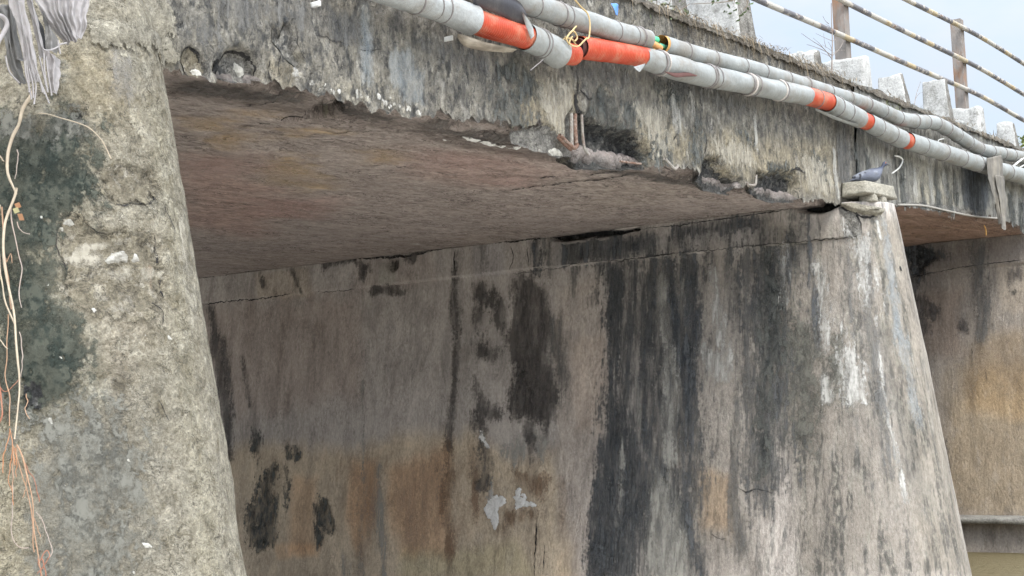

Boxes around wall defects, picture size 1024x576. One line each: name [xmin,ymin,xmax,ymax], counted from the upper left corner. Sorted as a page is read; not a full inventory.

spalling [180,48,254,83]
spalling [509,81,666,171]
crack [512,170,638,190]
spalling [692,141,862,238]
crack [203,270,290,305]
crack [358,247,456,271]
crack [498,207,874,274]
leakage [904,244,951,334]
leakage [208,303,246,461]
leakage [444,210,909,576]
leakage [243,424,301,556]
leakage [313,493,336,551]